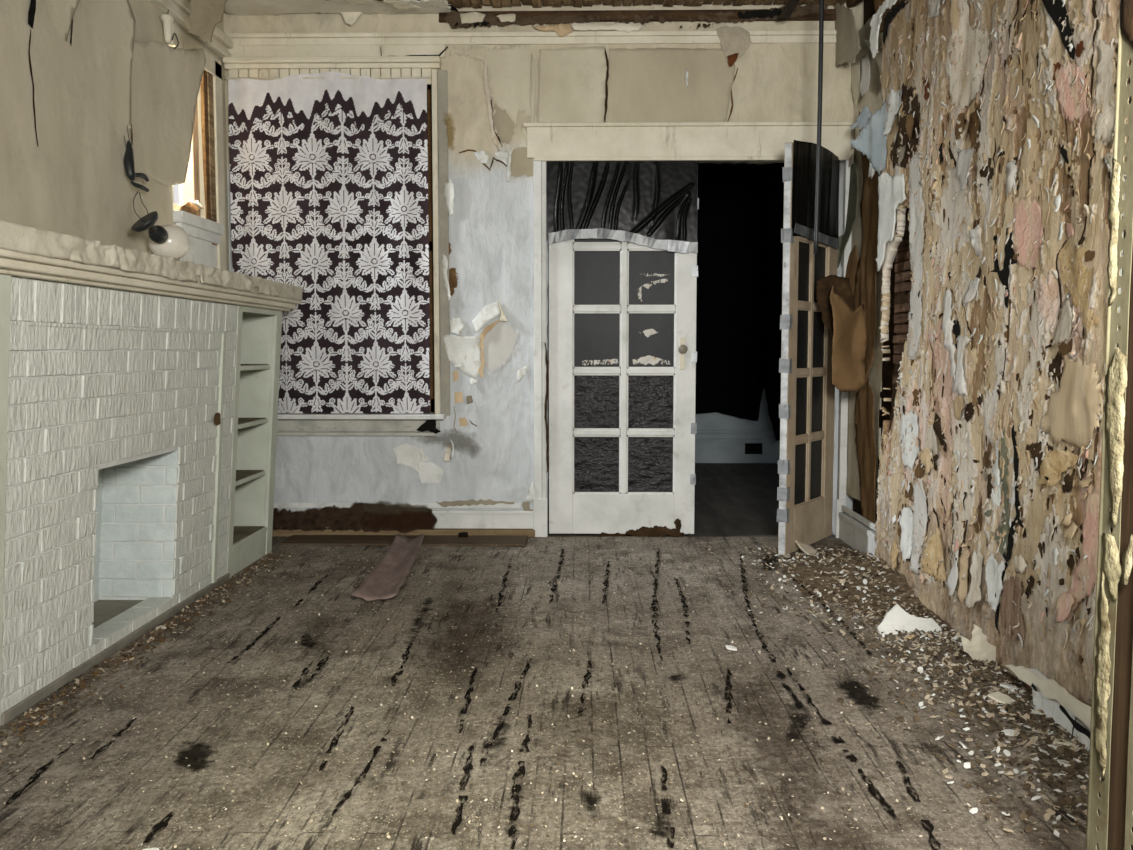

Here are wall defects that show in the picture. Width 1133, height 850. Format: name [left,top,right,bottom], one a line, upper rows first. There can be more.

peeling [340,12,363,25]
peeling [28,0,206,187]
crack [602,49,610,122]
crack [727,68,738,122]
peeling [437,0,1127,649]
peeling [417,301,528,462]
damp [273,501,437,533]
spalling [987,683,1019,705]